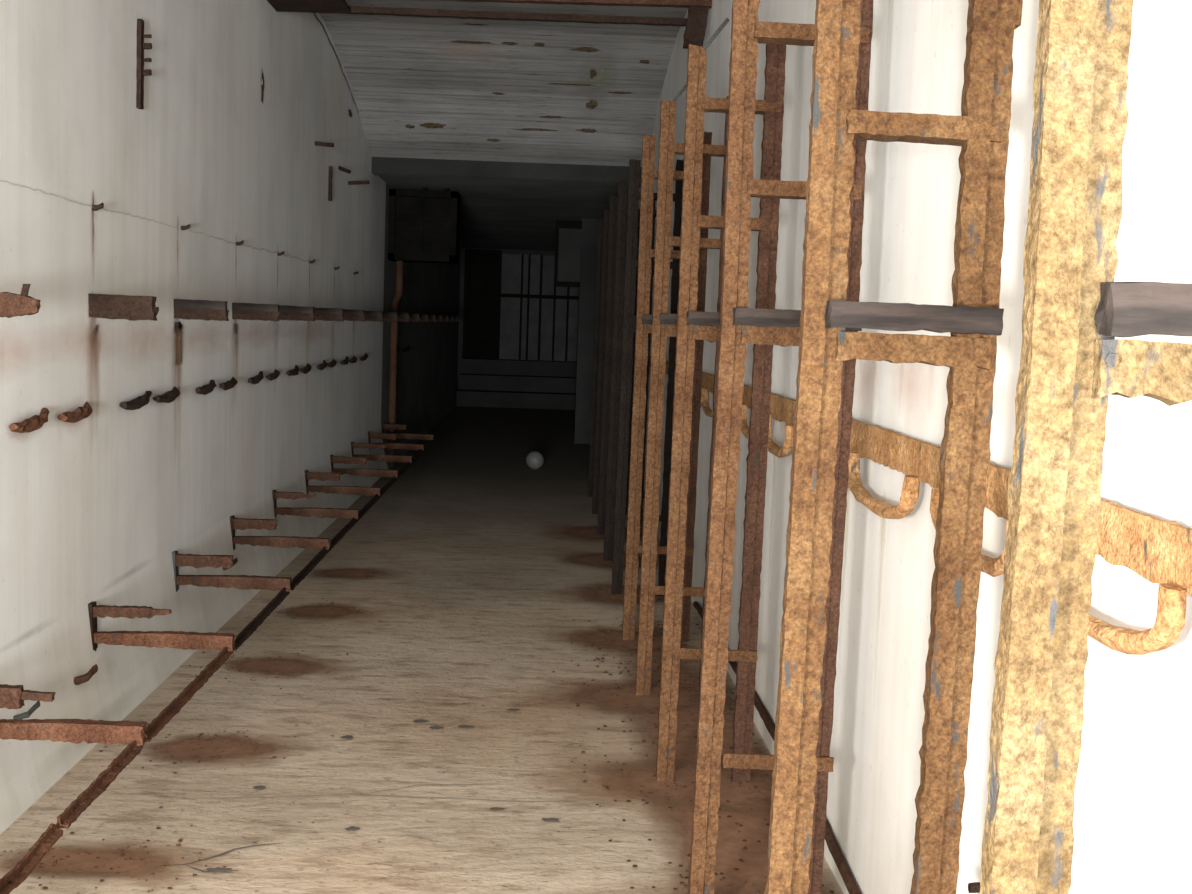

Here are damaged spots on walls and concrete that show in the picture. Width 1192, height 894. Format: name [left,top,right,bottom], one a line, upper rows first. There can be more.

crack [313,13,359,114]
crack [0,180,319,265]
corrosion [558,527,641,567]
corrosion [317,569,390,579]
corrosion [571,586,640,603]
corrosion [285,606,362,619]
corrosion [231,659,332,674]
corrosion [153,736,278,761]
corrosion [558,628,700,889]
corrosion [714,688,773,894]
corrosion [33,849,184,878]